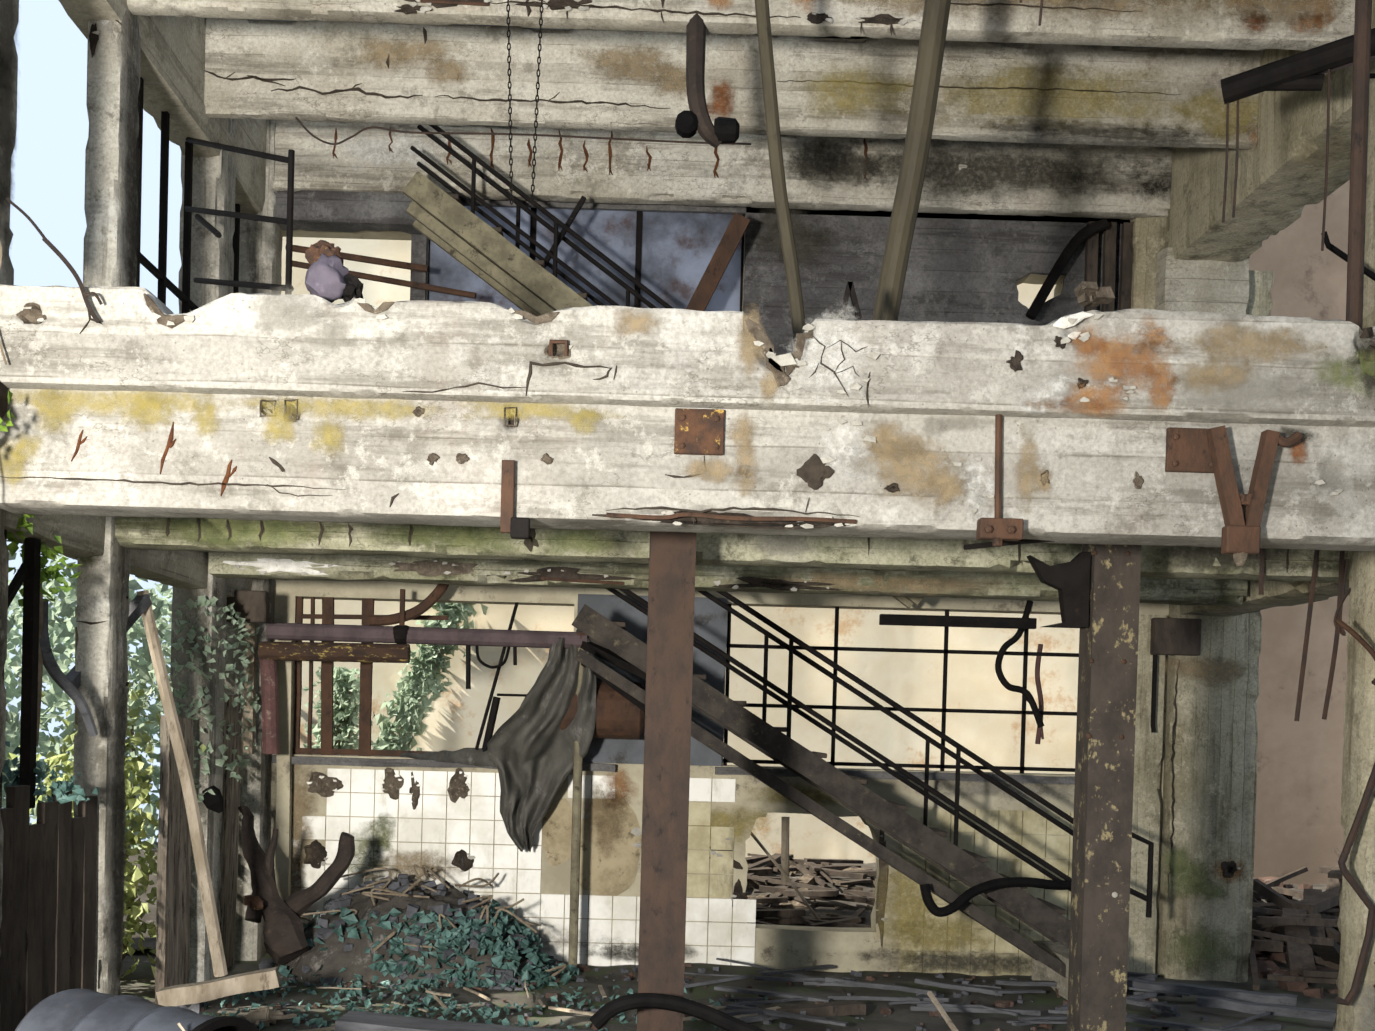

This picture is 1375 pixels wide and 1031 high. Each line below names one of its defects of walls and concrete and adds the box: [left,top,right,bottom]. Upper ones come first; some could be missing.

crack [204,55,670,175]
mould [794,142,902,182]
leakage [924,68,1259,195]
spalling [745,318,880,394]
crack [809,334,870,408]
corrosion [1045,326,1175,413]
leakage [17,391,214,430]
leakage [873,419,975,504]
spalling [307,772,344,797]
spalling [380,767,420,810]
spalling [448,768,471,803]
peeling [299,839,328,869]